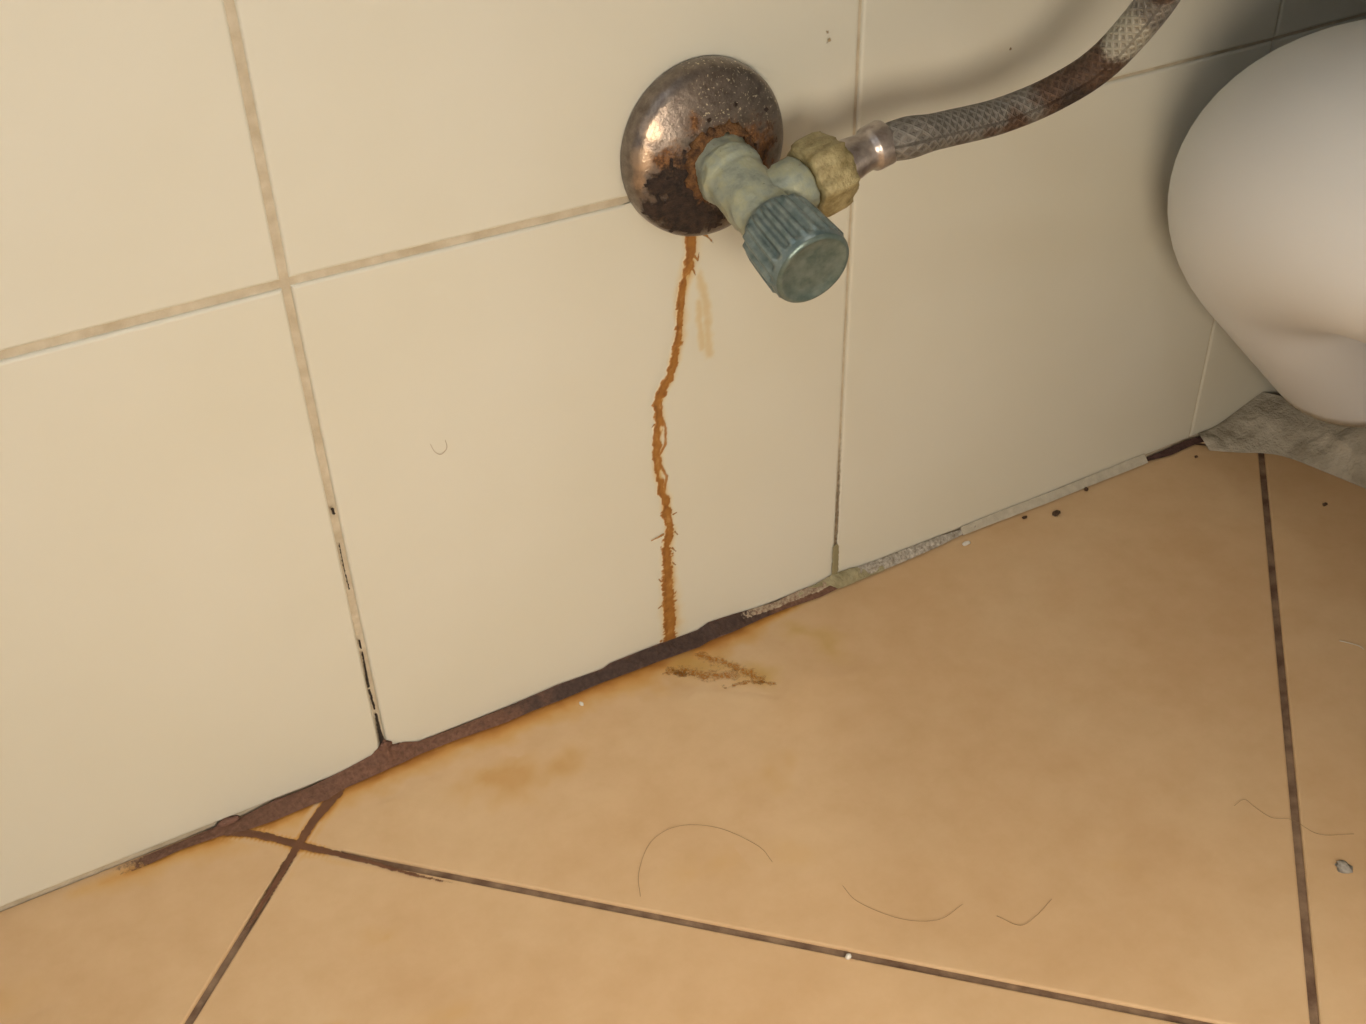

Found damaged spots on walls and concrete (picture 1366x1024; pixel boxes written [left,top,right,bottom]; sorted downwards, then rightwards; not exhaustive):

corrosion [684,119,757,203]
corrosion [749,64,784,146]
corrosion [621,180,853,654]
corrosion [48,664,698,930]